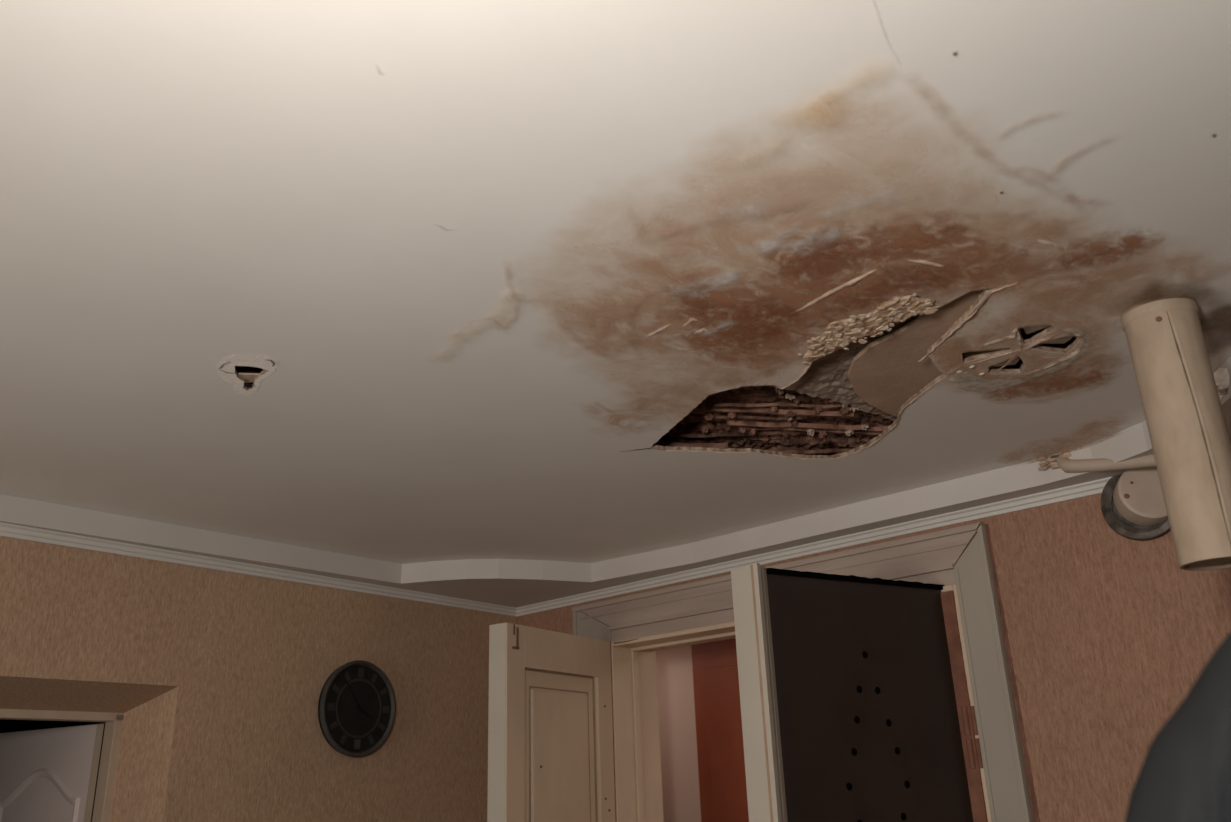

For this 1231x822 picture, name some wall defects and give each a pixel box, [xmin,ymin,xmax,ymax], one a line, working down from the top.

water stain [574,194,1145,398]
peeling [798,293,939,365]
water stain [1127,267,1200,308]
spalling [216,355,279,396]